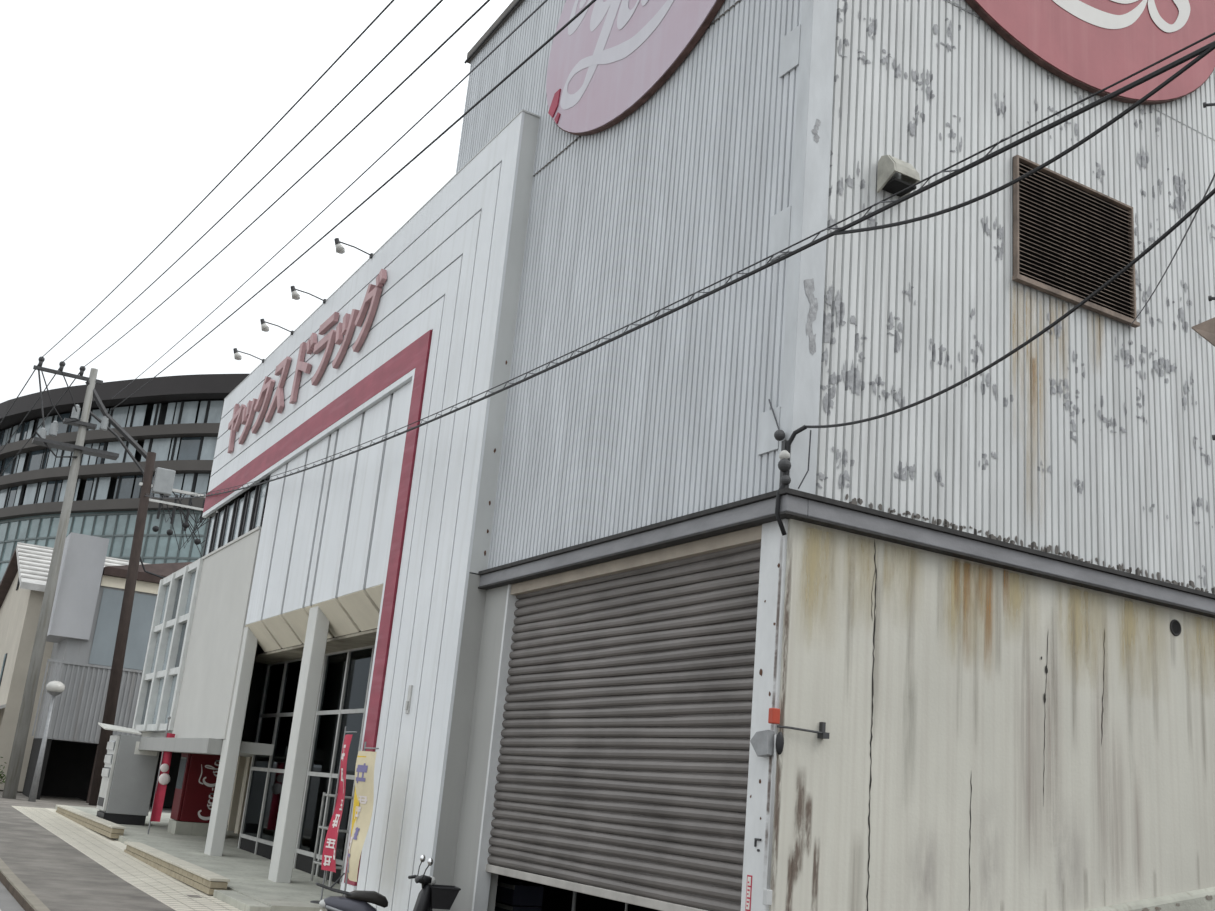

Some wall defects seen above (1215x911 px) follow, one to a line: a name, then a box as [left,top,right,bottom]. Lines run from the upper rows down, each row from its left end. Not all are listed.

peeling [1141,168,1189,218]
peeling [804,279,905,415]
peeling [929,335,1014,407]
peeling [1049,337,1197,443]
peeling [816,447,1215,594]
leakage [772,581,789,734]
crack [866,539,877,911]
rust [986,570,1008,627]
crack [1099,629,1107,744]
leakage [766,756,780,849]
leakage [786,785,818,911]
crack [966,785,974,911]